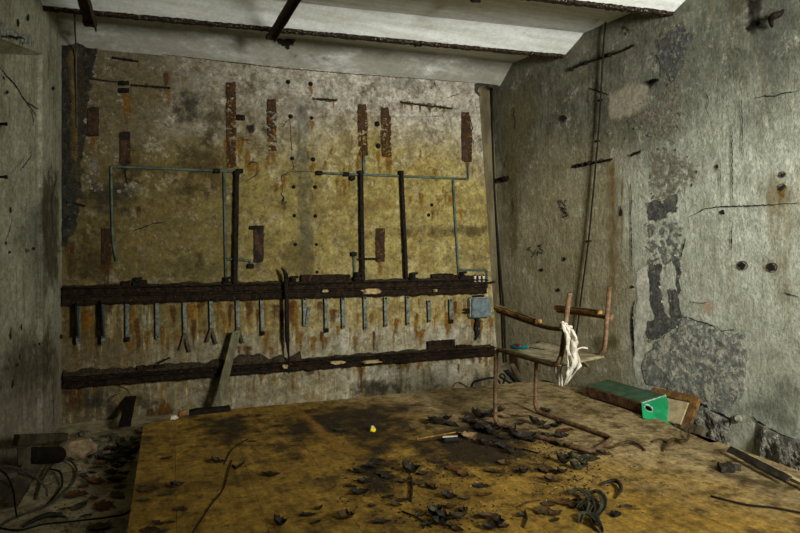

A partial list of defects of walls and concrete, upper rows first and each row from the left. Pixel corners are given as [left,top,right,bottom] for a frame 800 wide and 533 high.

peeling [652,20,694,82]
spalling [52,43,117,246]
crack [690,91,796,217]
peeling [631,147,749,413]
corrosion [246,301,327,349]
corrosion [317,302,357,347]
corrosion [414,299,460,344]